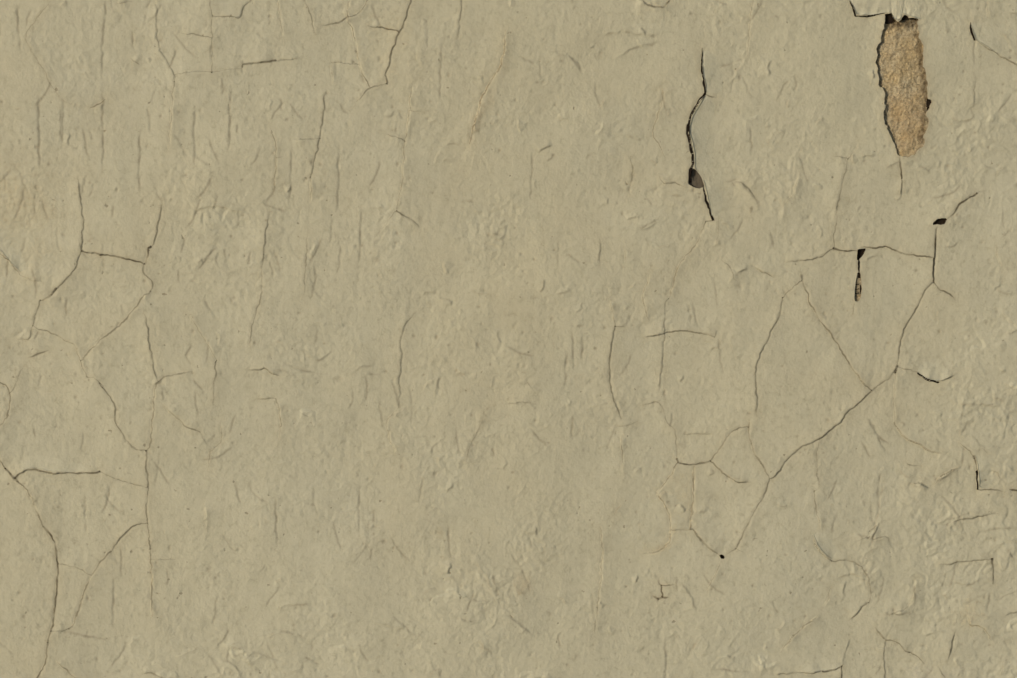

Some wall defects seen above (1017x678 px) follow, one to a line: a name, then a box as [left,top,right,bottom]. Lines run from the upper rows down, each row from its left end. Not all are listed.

crack [686,51,714,221]
peeling [850,0,932,157]
crack [846,237,936,281]